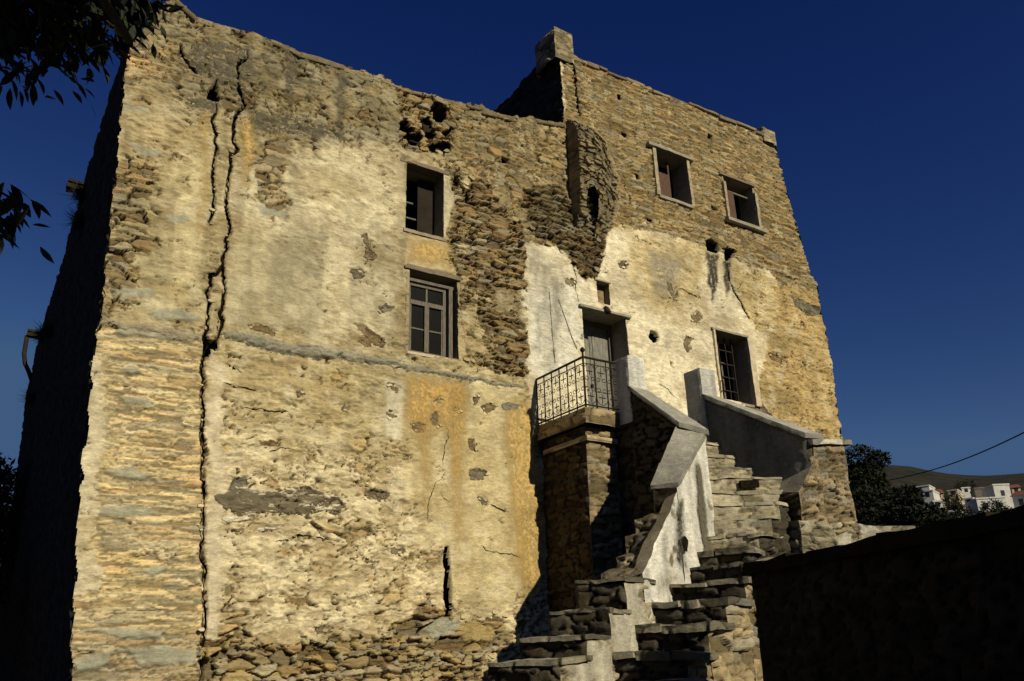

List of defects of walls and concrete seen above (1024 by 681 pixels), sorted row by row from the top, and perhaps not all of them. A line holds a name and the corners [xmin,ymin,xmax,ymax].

spalling [227,476,252,493]
crack [197,55,289,681]
flaking render [393,88,606,375]
water stain [706,253,731,299]